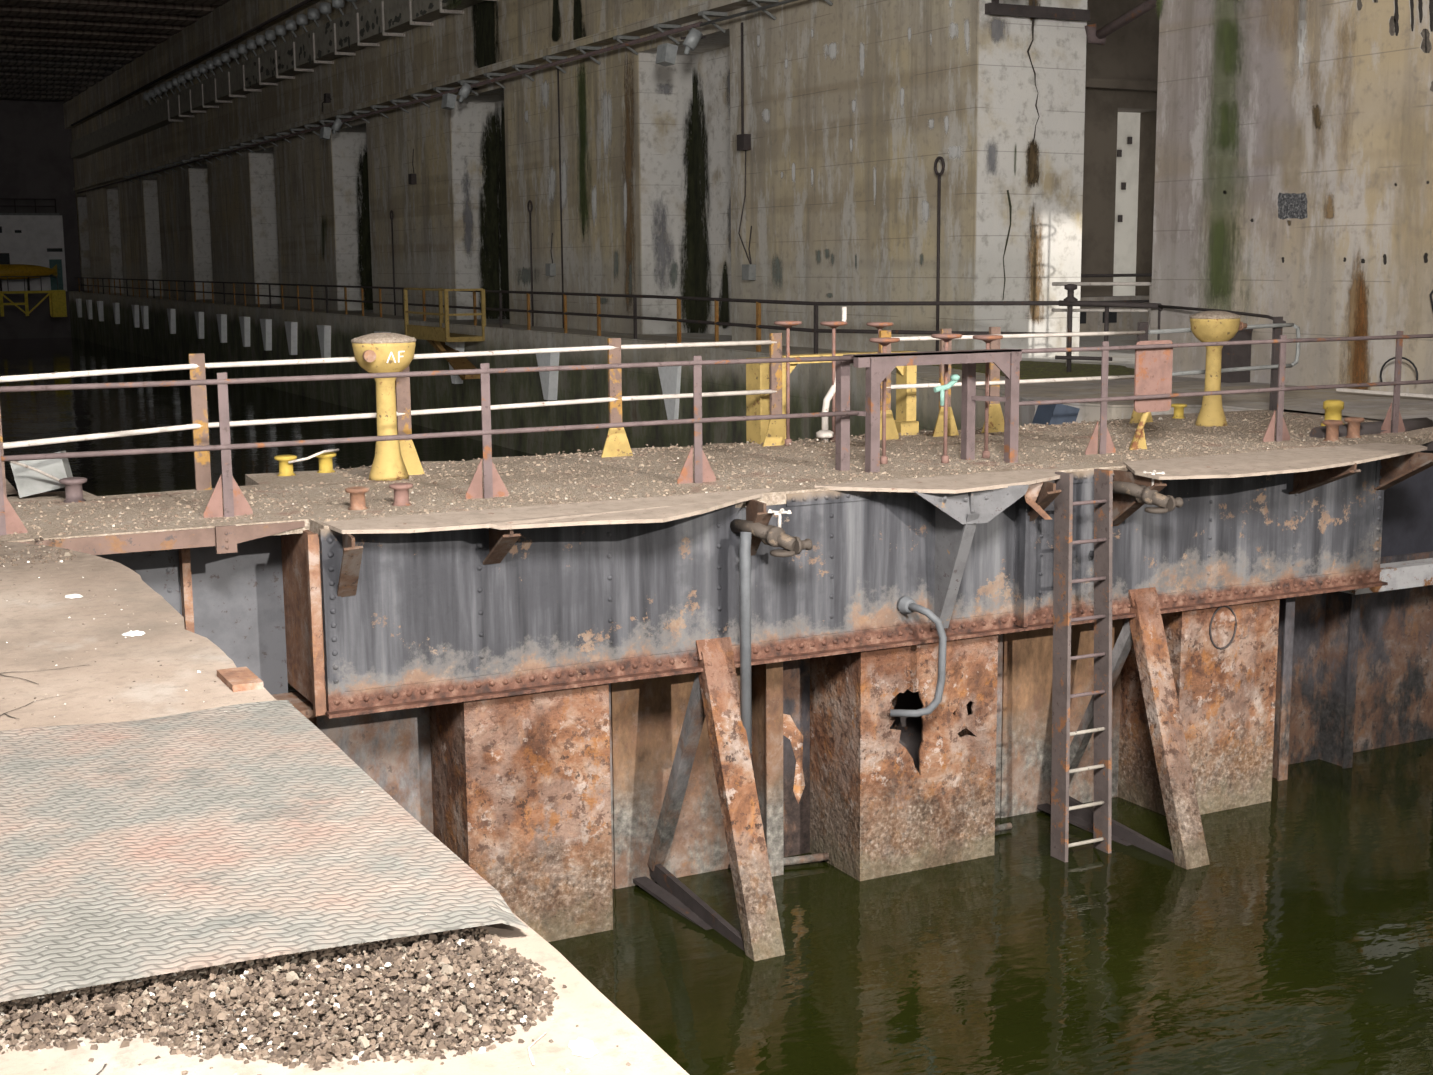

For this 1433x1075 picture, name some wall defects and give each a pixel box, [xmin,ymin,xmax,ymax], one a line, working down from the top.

leakage [495,106,536,320]
leakage [549,56,635,310]
leakage [653,205,677,288]
leakage [1211,221,1231,296]
rust [1347,257,1369,390]